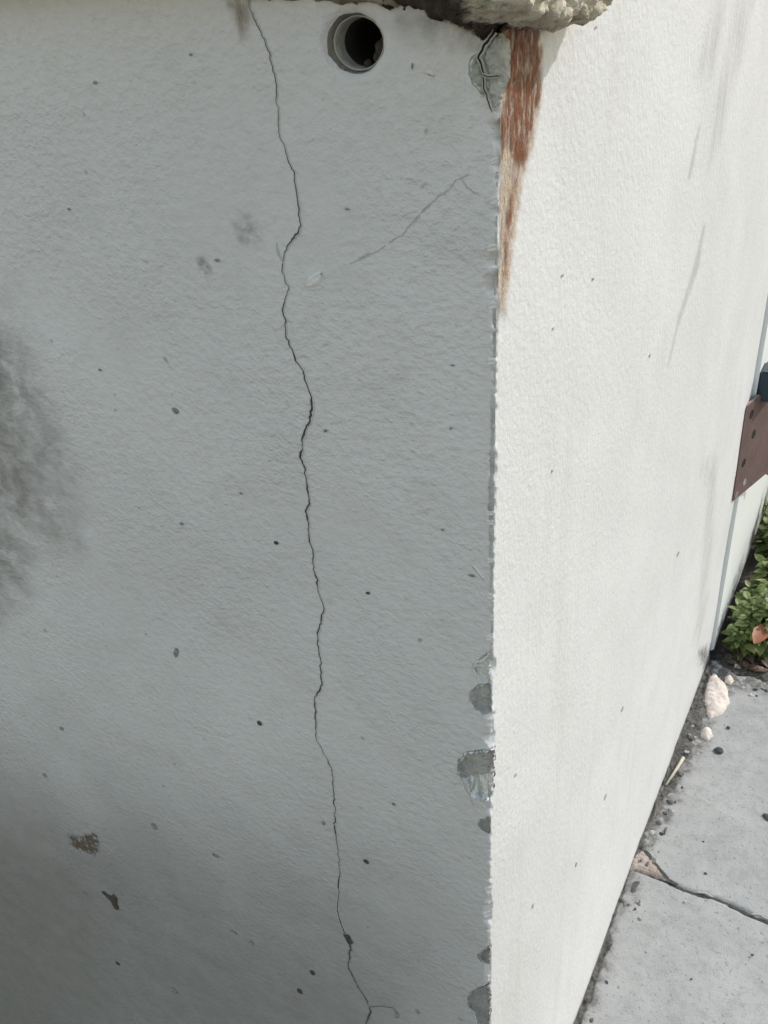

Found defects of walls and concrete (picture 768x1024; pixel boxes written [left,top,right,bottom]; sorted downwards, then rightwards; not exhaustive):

spalling [382,0,508,97]
corrosion [498,28,543,312]
crack [350,174,475,265]
crack [248,0,397,1024]
spalling [457,747,496,807]
spalling [478,817,491,834]
spalling [478,946,491,964]
spalling [467,984,491,1024]